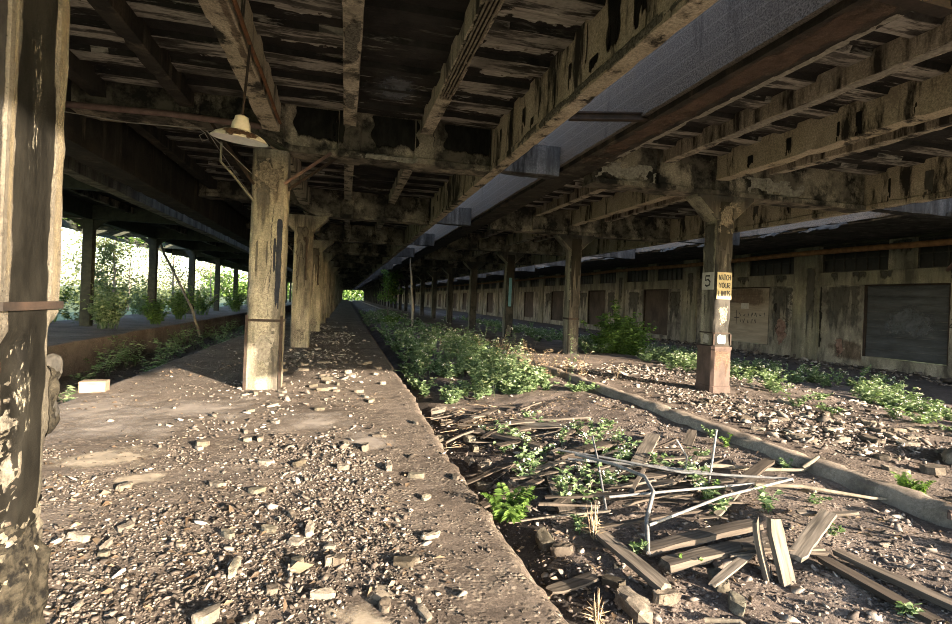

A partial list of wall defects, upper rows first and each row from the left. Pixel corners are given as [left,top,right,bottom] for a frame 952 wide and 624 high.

peeling [274,4,332,18]
damp [584,0,621,73]
damp [444,87,541,157]
damp [772,275,793,337]
damp [805,268,866,347]
spalling [45,364,61,437]
spalling [0,381,20,500]
spalling [0,494,51,624]